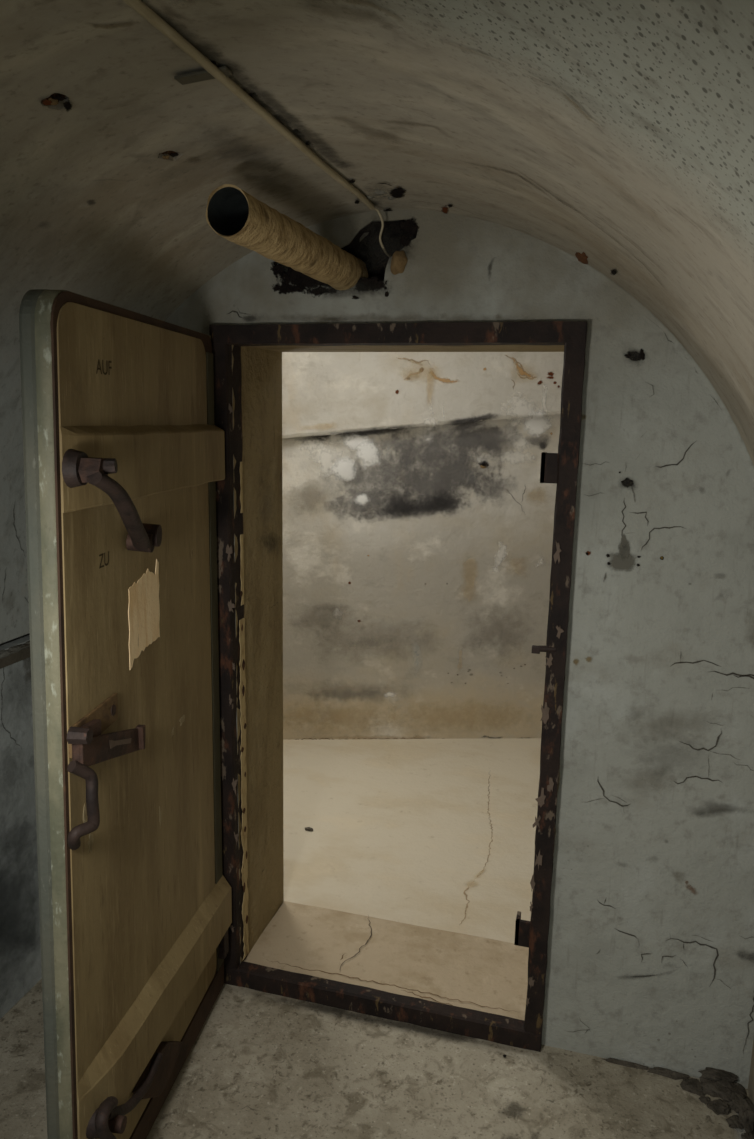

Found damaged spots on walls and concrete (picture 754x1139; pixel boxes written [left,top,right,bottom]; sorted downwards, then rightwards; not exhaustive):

spalling [42,93,72,111]
spalling [341,183,418,282]
corrosion [395,358,457,394]
corrosion [506,355,560,388]
damp [339,408,509,518]
crack [671,657,754,695]
crack [674,723,751,784]
crack [589,781,630,806]
crack [266,919,507,1011]
crack [598,899,754,1044]
spalling [603,1058,754,1139]